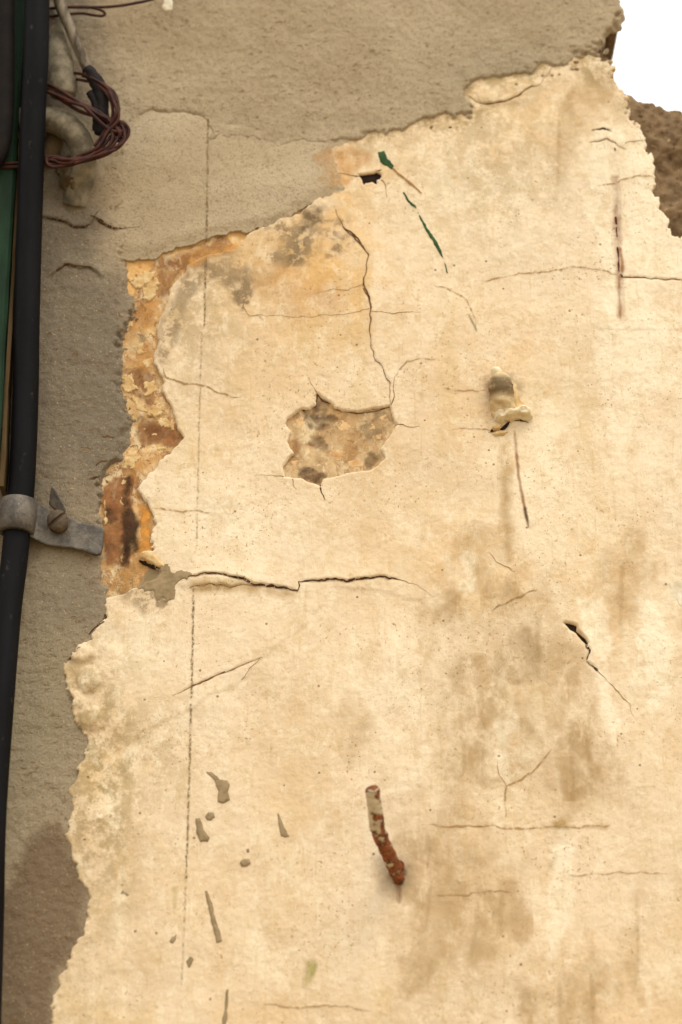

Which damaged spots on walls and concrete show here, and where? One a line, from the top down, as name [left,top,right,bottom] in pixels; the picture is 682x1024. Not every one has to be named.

spalling [47,215,138,229]
crack [243,212,429,402]
crack [487,266,681,281]
peeling [89,236,232,597]
crack [163,370,238,398]
spalling [268,377,417,499]
crack [188,572,432,596]
crack [565,623,634,716]
rust [365,785,405,884]